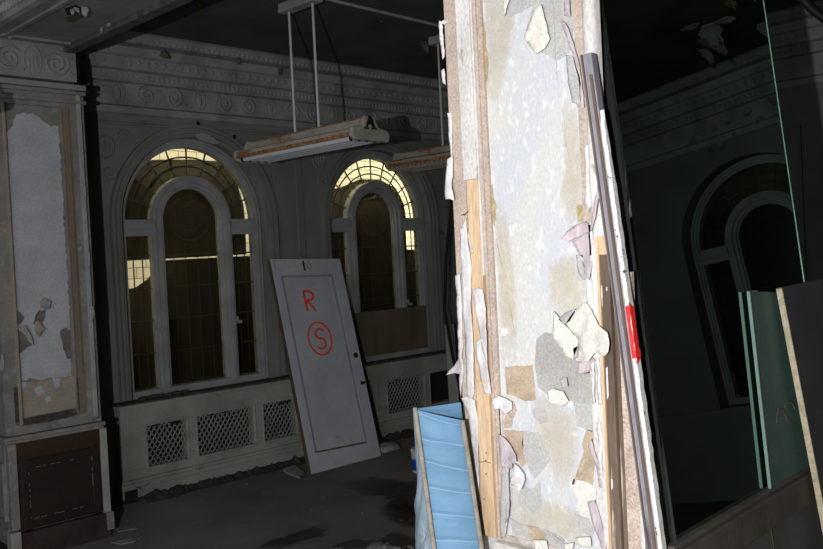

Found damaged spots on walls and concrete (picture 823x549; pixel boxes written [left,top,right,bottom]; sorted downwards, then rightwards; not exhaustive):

peeling [503,0,584,108]
spalling [7,112,77,418]
peeling [447,218,613,549]
peeling [561,145,607,306]